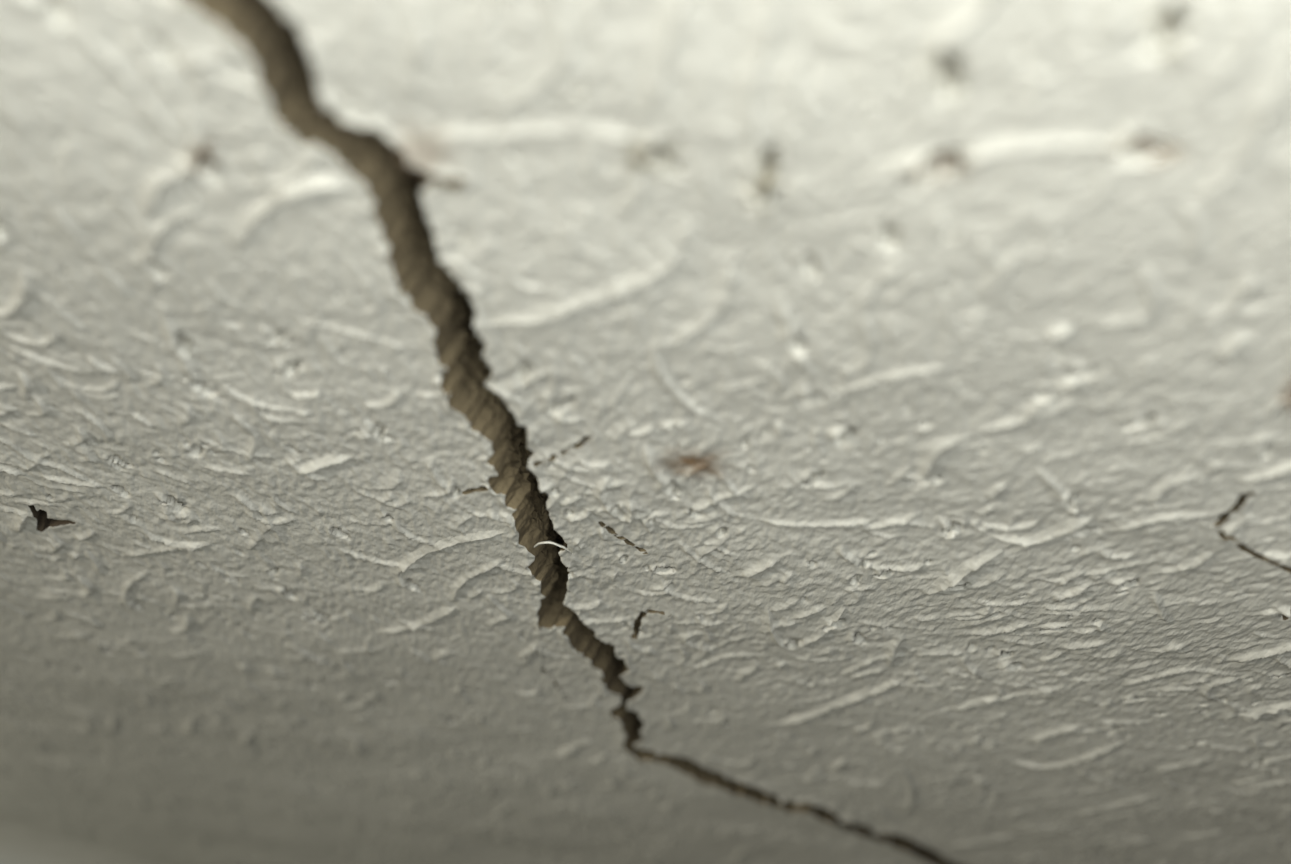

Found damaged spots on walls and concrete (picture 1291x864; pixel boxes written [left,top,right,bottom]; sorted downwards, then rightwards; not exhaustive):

crack [178,0,958,864]
crack [1213,491,1291,574]